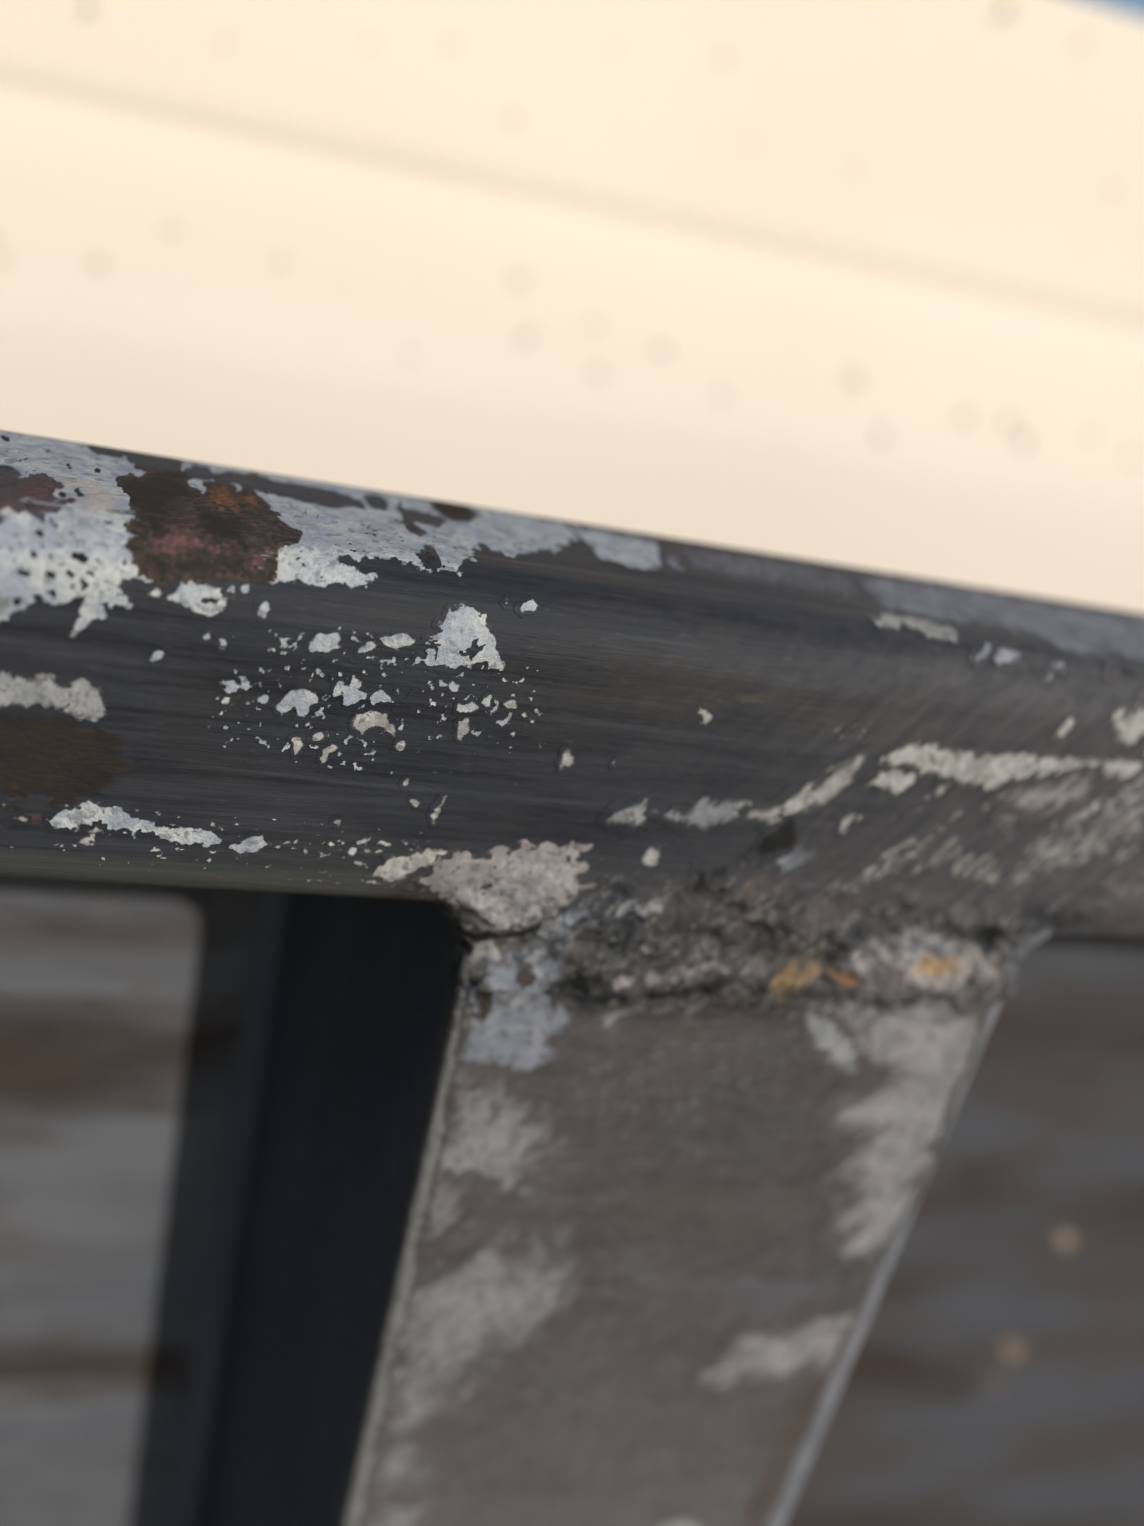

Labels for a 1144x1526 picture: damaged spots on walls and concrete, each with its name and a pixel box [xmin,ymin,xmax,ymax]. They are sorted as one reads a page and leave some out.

corrosion [0,464,306,590]
peeling [0,431,1144,767]
corrosion [0,703,154,832]
peeling [0,793,276,858]
corrosion [0,877,258,1181]
peeling [325,712,1144,1526]